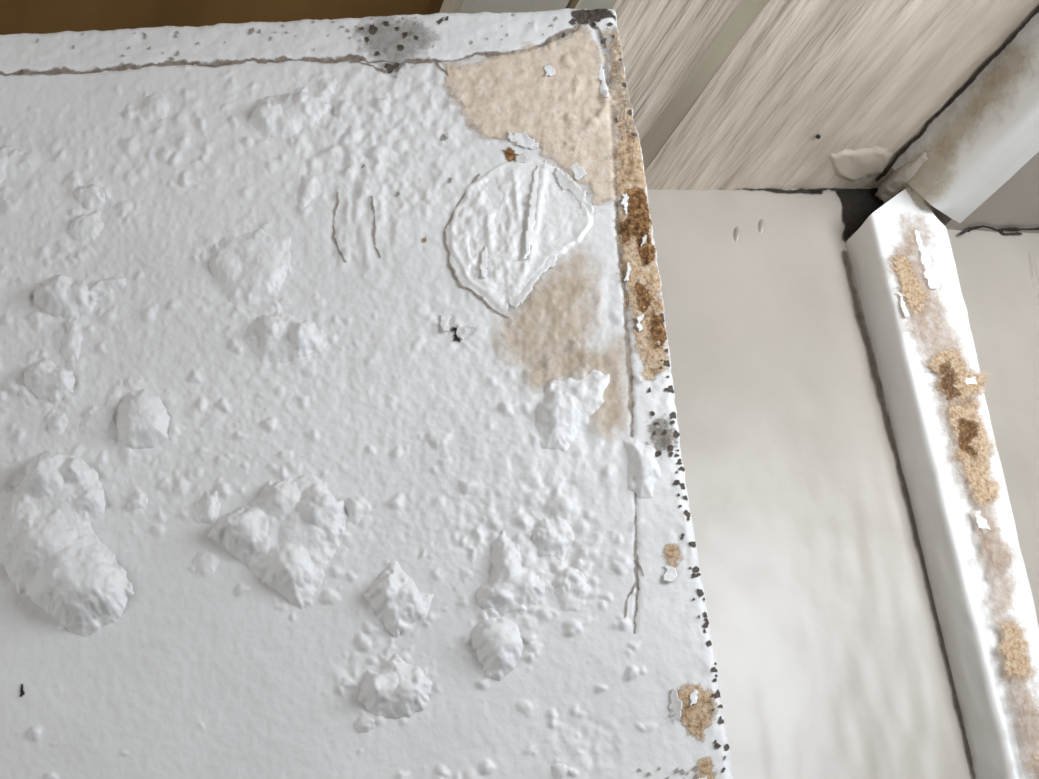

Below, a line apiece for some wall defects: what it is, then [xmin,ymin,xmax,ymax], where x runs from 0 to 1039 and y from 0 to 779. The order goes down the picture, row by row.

crack [0,16,609,89]
leakage [327,17,434,73]
peeling [443,24,620,318]
crack [332,192,347,262]
crack [371,196,381,258]
leakage [508,263,624,432]
leakage [659,335,674,393]
leakage [646,411,691,521]
crack [624,493,643,634]
leakage [689,566,712,646]
leakage [711,662,724,724]
leakage [637,766,698,779]